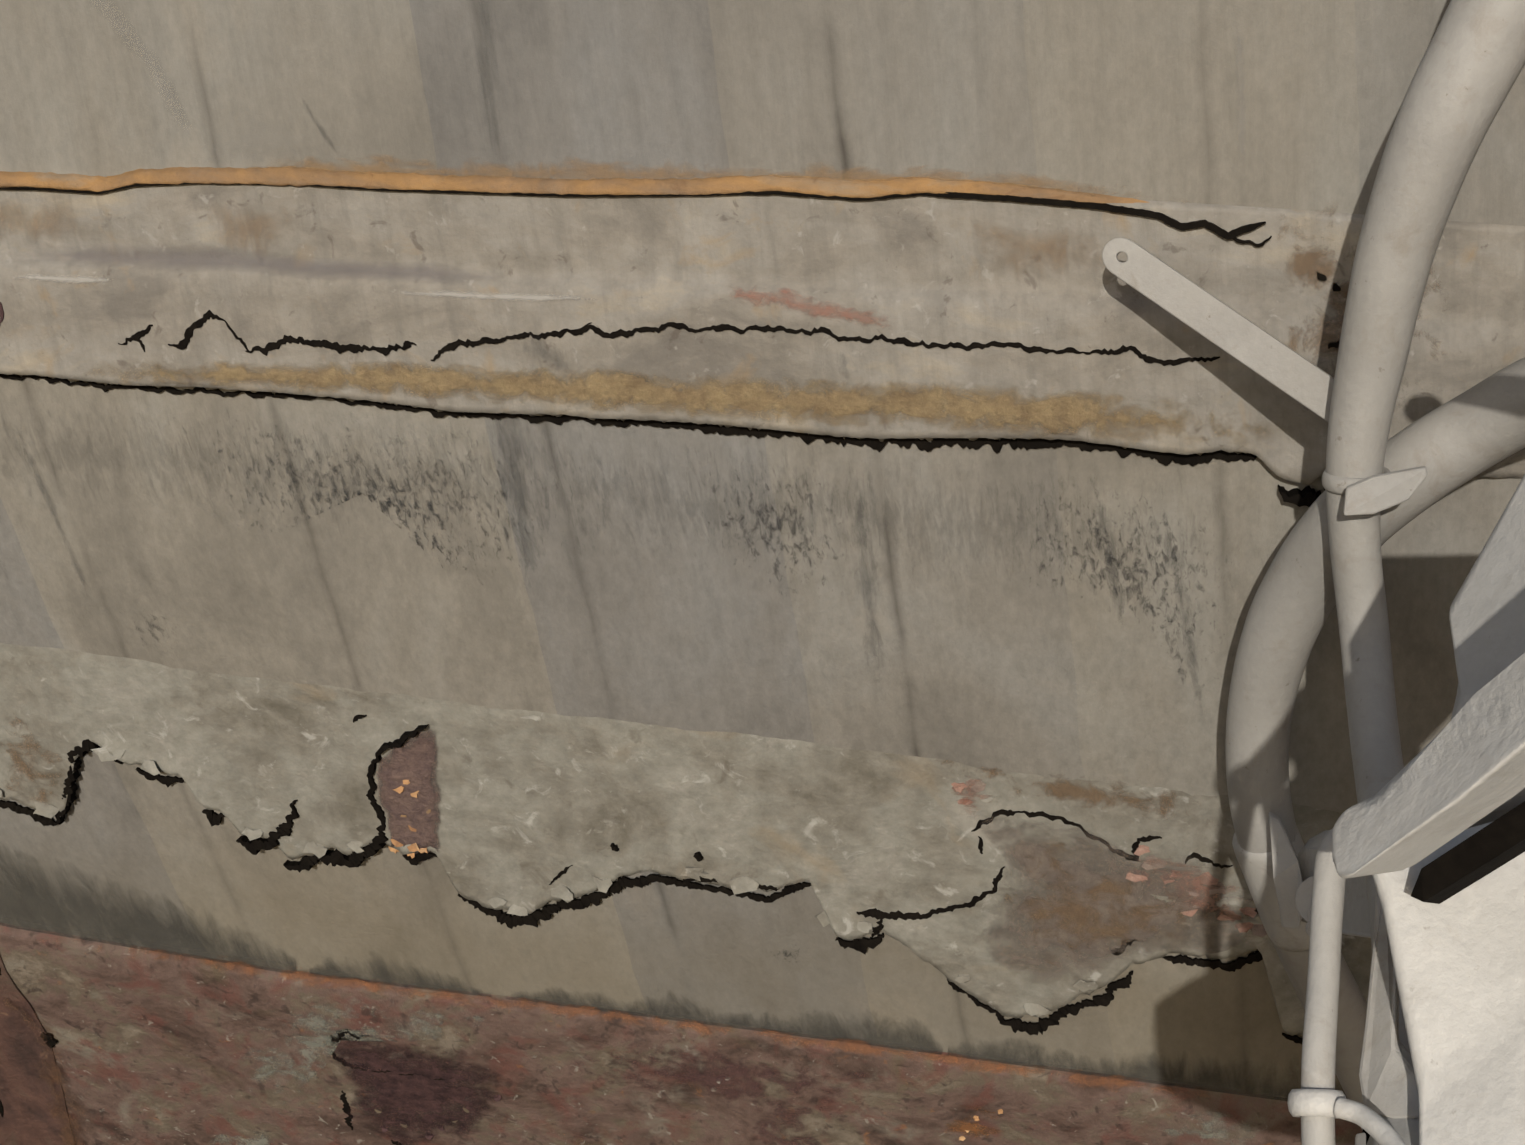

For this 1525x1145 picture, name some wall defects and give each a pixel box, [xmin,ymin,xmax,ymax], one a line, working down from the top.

crack [0,183,264,194]
crack [305,185,1272,247]
crack [0,310,1325,507]
spalling [377,732,440,858]
corrosion [761,1031,1032,1074]
corrosion [950,1109,1003,1141]